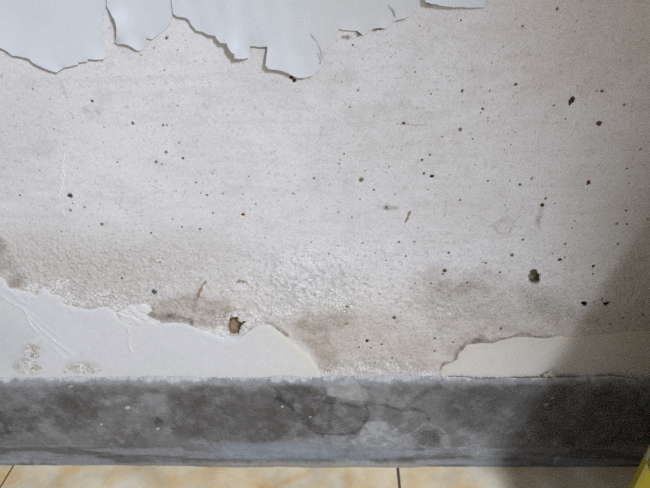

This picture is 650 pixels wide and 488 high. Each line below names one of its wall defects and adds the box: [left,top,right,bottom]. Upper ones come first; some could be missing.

peeling [0,0,486,82]
damp [249,267,357,322]
flaking render [0,277,321,378]
damp [321,356,439,401]
flaking render [440,330,650,377]
damp [350,421,448,456]